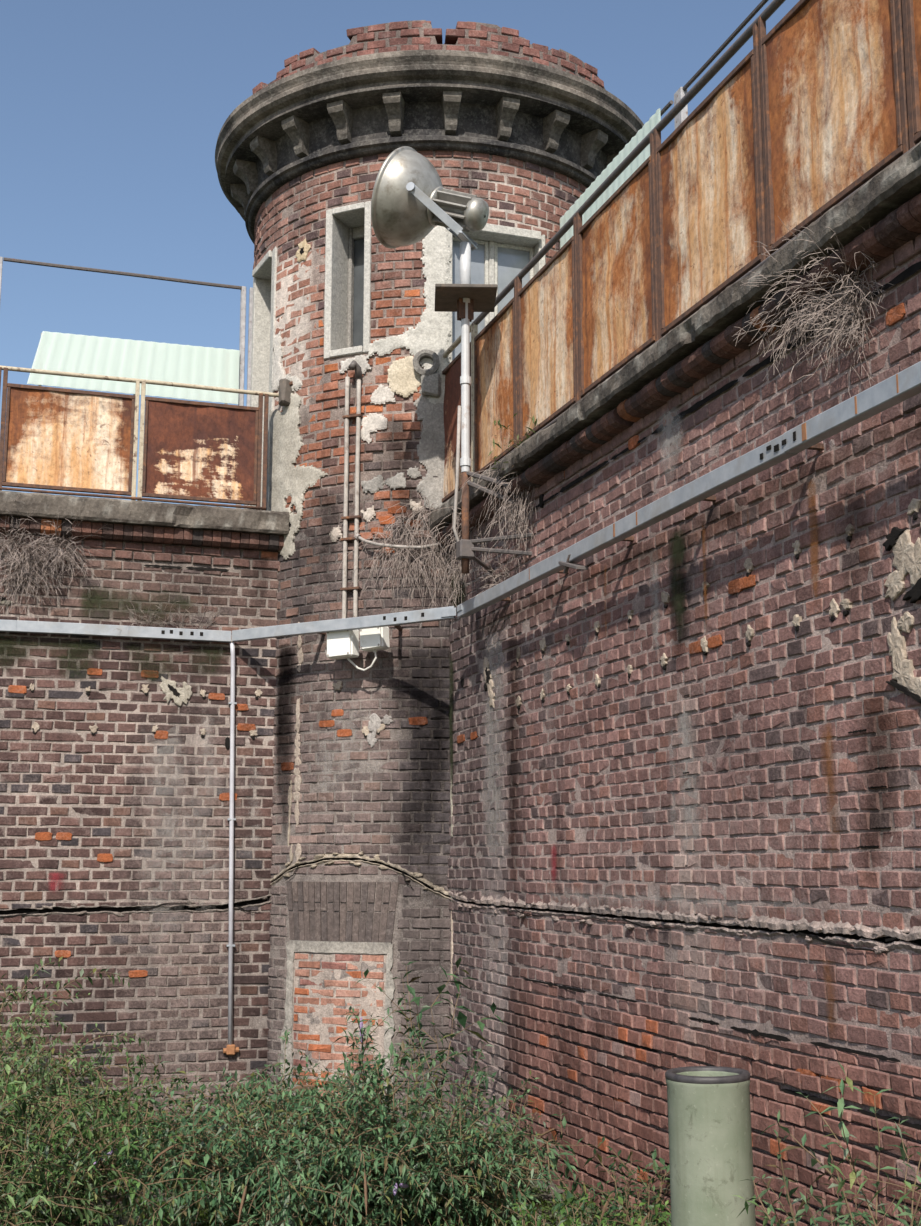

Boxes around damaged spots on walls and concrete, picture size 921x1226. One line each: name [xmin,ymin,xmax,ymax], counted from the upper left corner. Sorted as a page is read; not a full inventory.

peeling [339,226,451,534]
peeling [267,331,328,560]
peeling [329,525,343,542]
spalling [882,522,921,704]
spalling [141,670,192,706]
spalling [154,730,168,739]
spalling [208,693,256,749]
spalling [319,709,428,748]
crack [868,766,888,789]
crack [857,827,892,848]
crack [0,851,921,962]